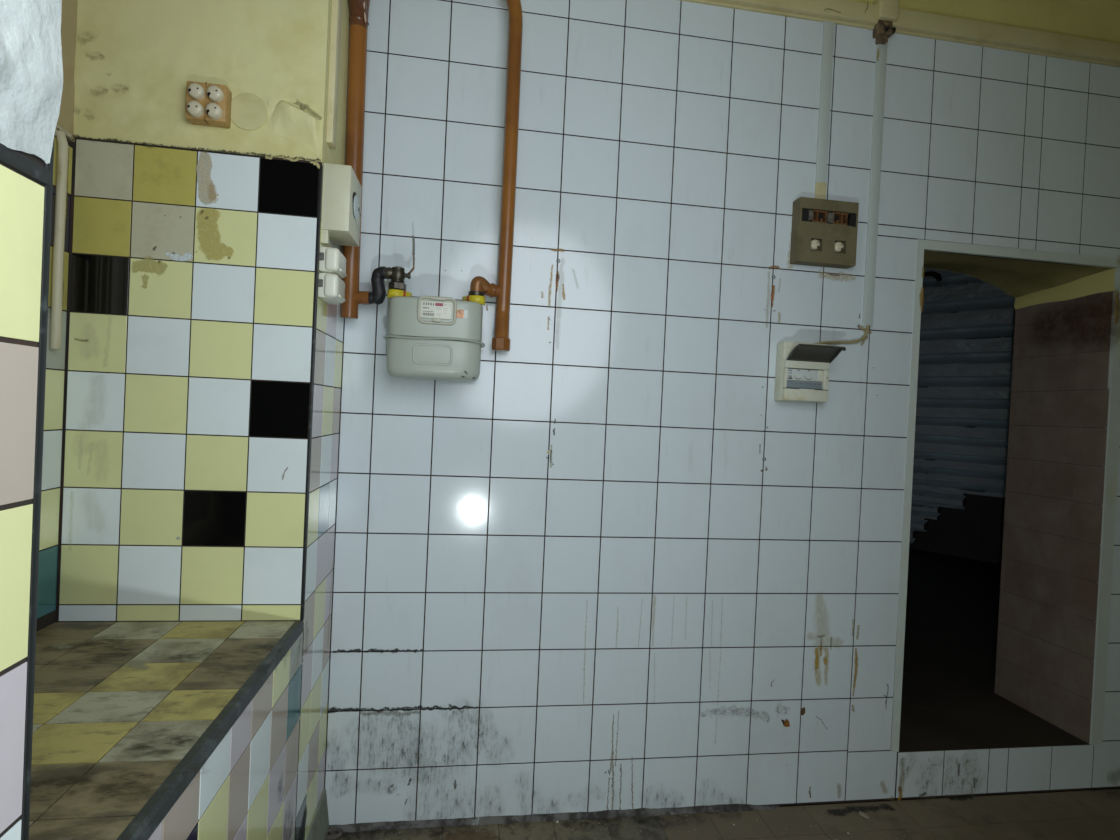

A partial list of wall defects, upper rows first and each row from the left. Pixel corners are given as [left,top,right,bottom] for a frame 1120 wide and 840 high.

peeling [132,152,233,289]
leakage [327,704,478,729]